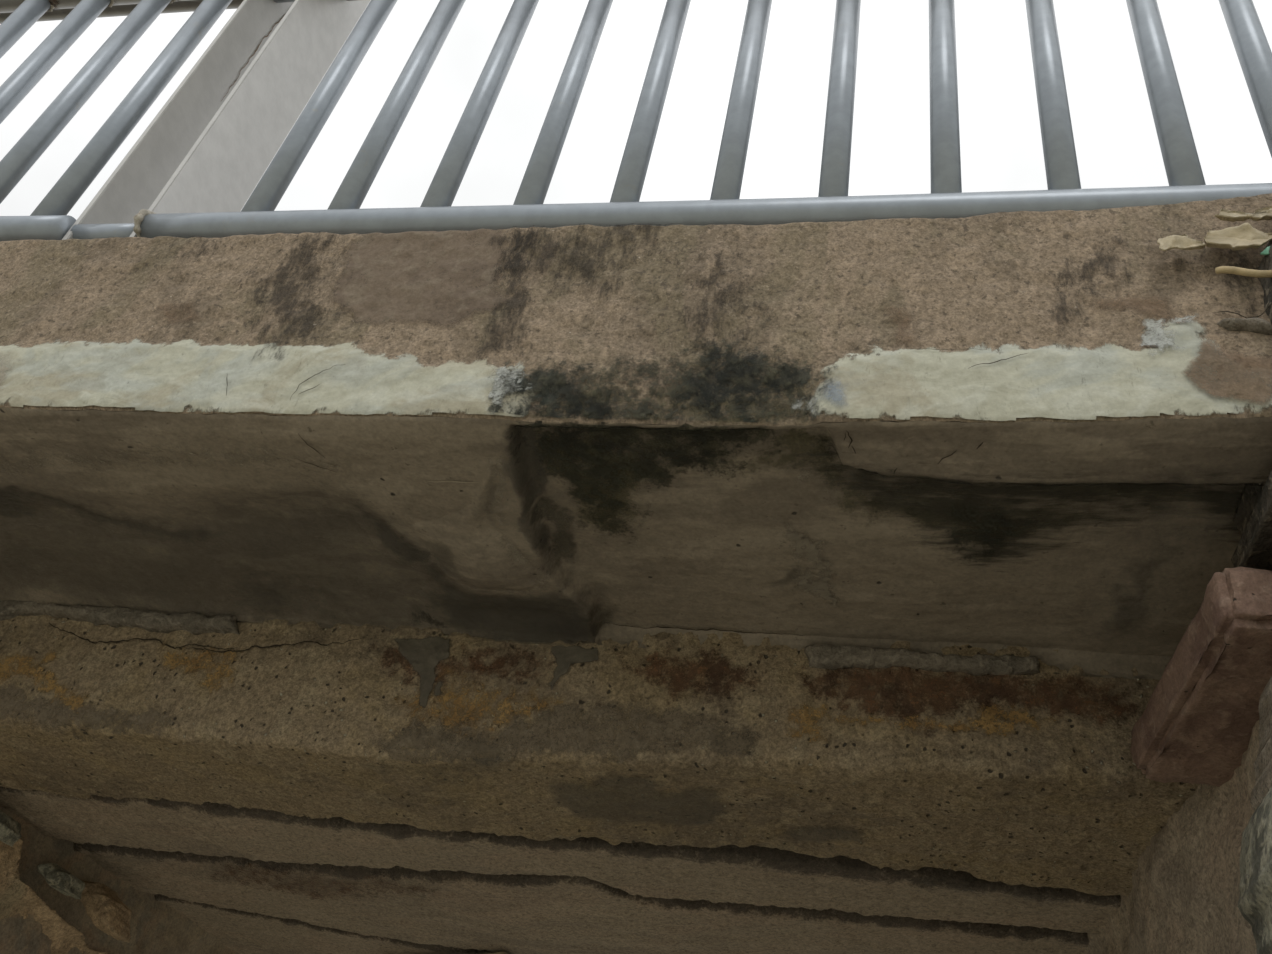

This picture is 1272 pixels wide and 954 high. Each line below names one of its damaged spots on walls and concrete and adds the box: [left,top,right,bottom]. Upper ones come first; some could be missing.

peeling [1217,318,1272,335]
leakage [488,366,532,414]
spalling [1184,340,1272,403]
leakage [505,425,583,558]
corrosion [622,649,767,704]
corrosion [800,666,1139,736]